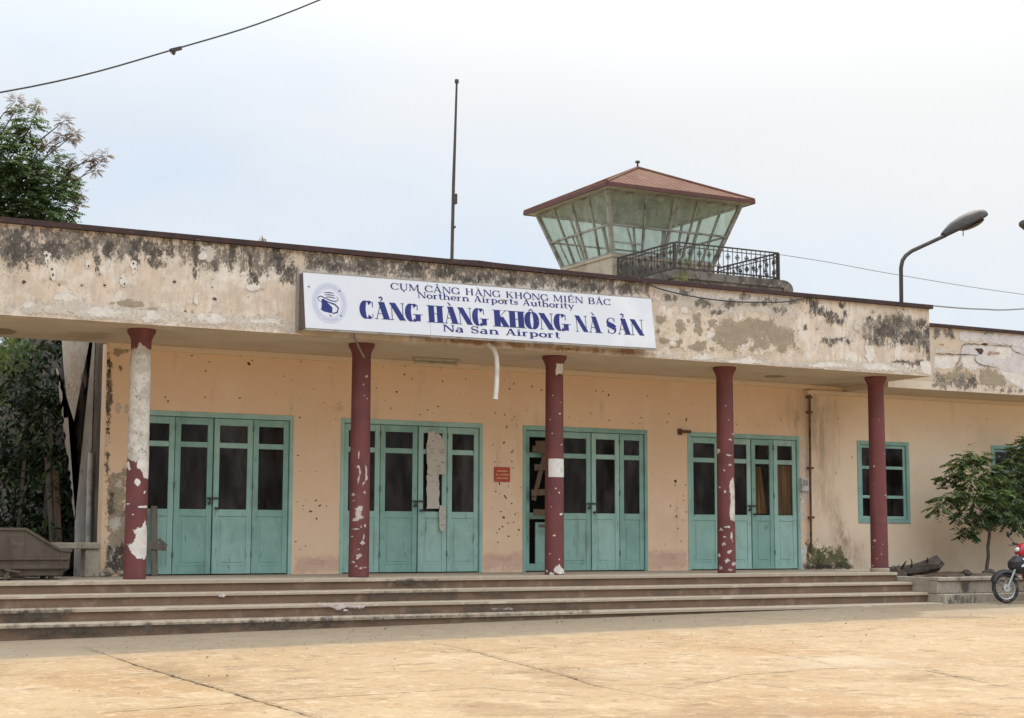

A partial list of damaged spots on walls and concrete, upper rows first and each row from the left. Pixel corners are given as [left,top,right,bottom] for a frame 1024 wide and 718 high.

damp [0,223,1024,393]
damp [106,353,122,434]
damp [105,542,124,574]
peeling [102,343,152,572]
peeling [351,452,368,569]
peeling [717,419,737,571]